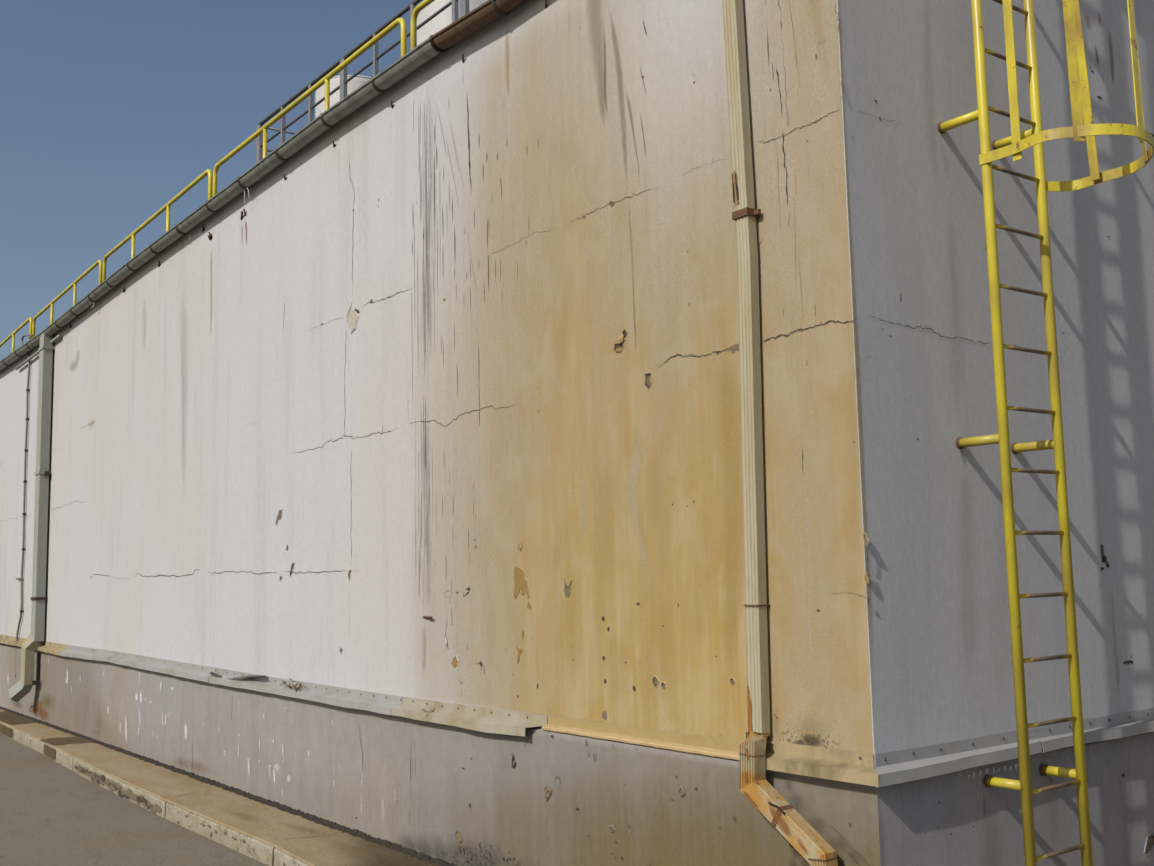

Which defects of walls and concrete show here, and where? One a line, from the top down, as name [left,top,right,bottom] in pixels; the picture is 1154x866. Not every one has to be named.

damp [613,34,646,172]
crack [759,61,894,224]
damp [412,107,444,298]
crack [494,189,654,253]
peeling [346,303,360,334]
flaking render [613,328,628,353]
crack [656,317,1020,367]
crack [297,318,516,469]
peeling [514,567,532,609]
damp [560,807,810,866]
damp [825,835,880,866]